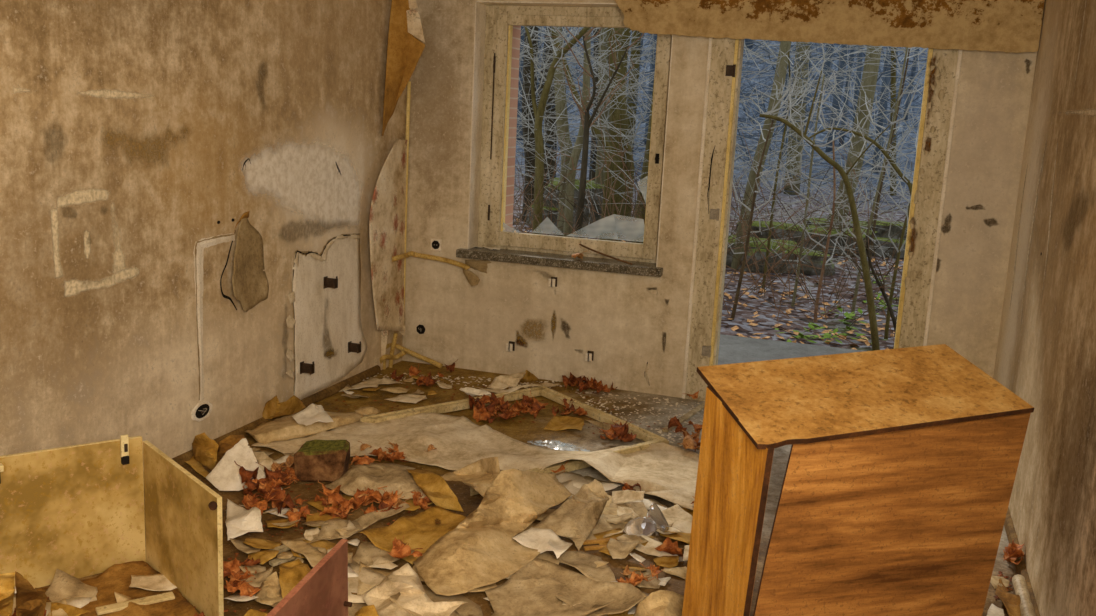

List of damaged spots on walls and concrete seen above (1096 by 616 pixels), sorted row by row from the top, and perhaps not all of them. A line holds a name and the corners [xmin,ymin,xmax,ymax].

peeling [243,143,367,400]